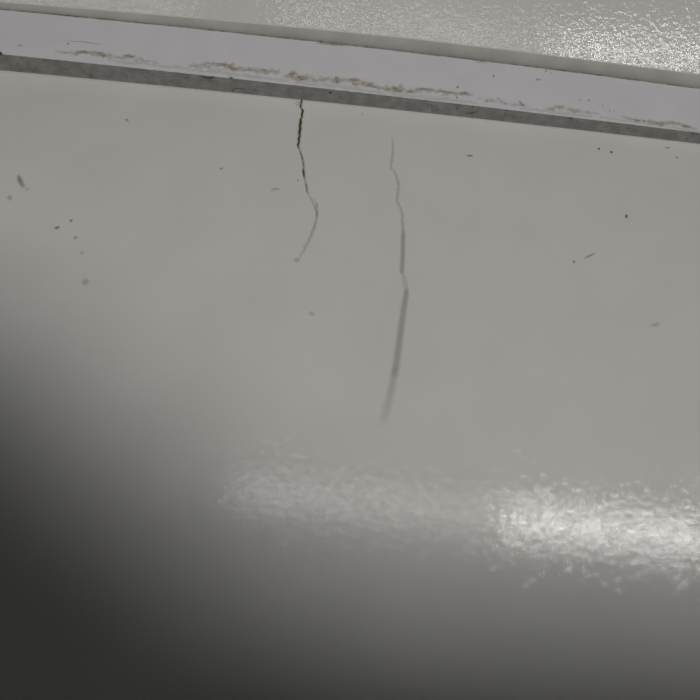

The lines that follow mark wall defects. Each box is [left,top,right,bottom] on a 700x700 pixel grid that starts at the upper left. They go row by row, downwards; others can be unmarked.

crack [297,100,318,207]
crack [391,154,408,366]